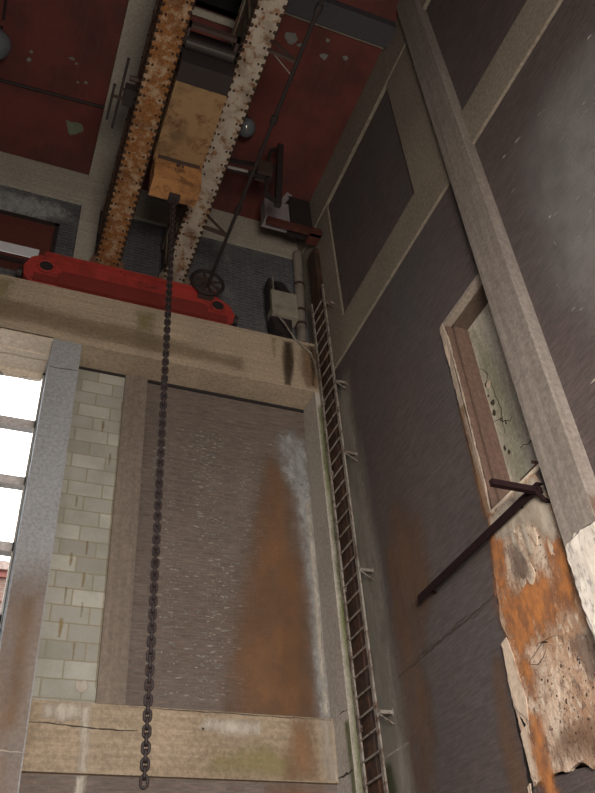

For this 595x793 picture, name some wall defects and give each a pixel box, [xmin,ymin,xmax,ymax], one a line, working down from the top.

crack [32,721,138,731]
leakage [141,407,337,780]
corrosion [238,472,309,717]
corrosion [476,470,575,694]
corrosion [529,713,557,793]
flaking render [492,474,595,787]